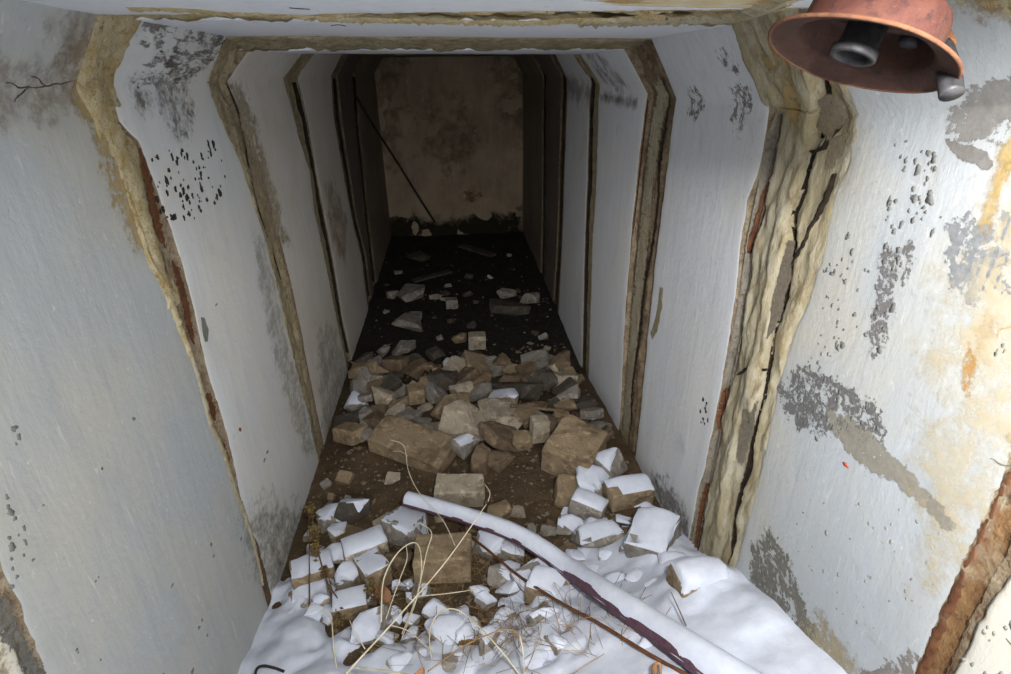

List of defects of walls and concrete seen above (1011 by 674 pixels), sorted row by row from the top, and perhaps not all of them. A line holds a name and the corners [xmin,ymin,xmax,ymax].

water stain [601,0,763,8]
crack [6,76,73,102]
rust [139,148,166,248]
water stain [150,76,226,221]
crack [824,80,832,103]
peeling [945,76,1011,170]
rust [172,260,195,345]
crack [731,126,843,557]
peeling [776,140,955,535]
peeling [930,210,1011,308]
water stain [961,221,1011,375]
rust [915,468,1011,674]